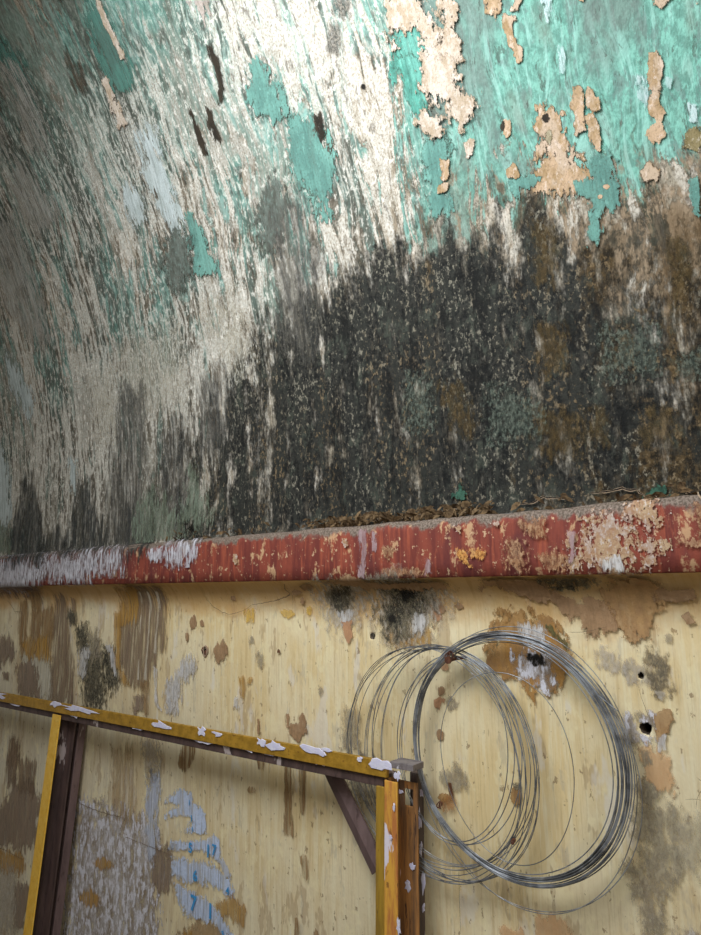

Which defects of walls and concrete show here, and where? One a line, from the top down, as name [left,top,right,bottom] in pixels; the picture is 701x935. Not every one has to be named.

peeling [483,0,523,64]
peeling [382,0,482,219]
peeling [500,118,512,138]
peeling [506,85,621,248]
flaking render [639,160,661,183]
peeling [645,48,666,145]
flaking render [682,126,701,155]
peeling [688,175,701,218]
leakage [0,185,701,716]
flaking render [455,547,487,568]
peeling [478,498,701,705]
flaking render [620,708,676,796]